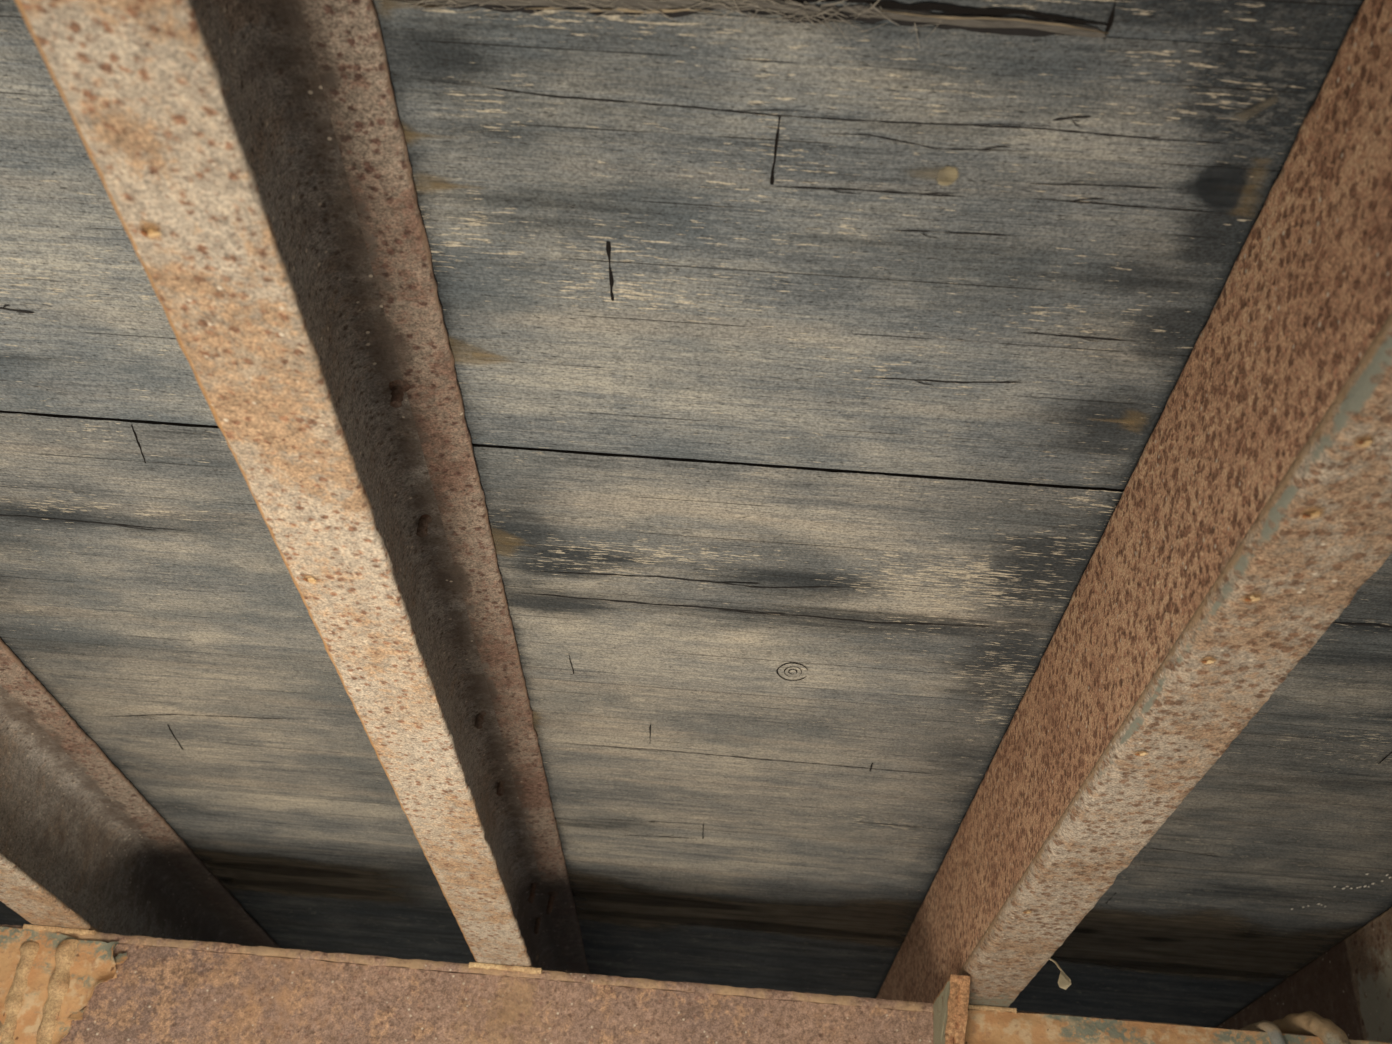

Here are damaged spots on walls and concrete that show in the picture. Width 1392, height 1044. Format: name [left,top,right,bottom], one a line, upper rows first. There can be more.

crack [395,0,1110,49]
crack [415,78,1269,152]
crack [1037,181,1229,214]
water stain [1187,167,1243,210]
rust [138,222,161,239]
water stain [192,850,413,903]
water stain [567,872,921,947]
water stain [1051,910,1357,982]
peeling [0,927,127,1044]
peeling [964,1010,1324,1044]